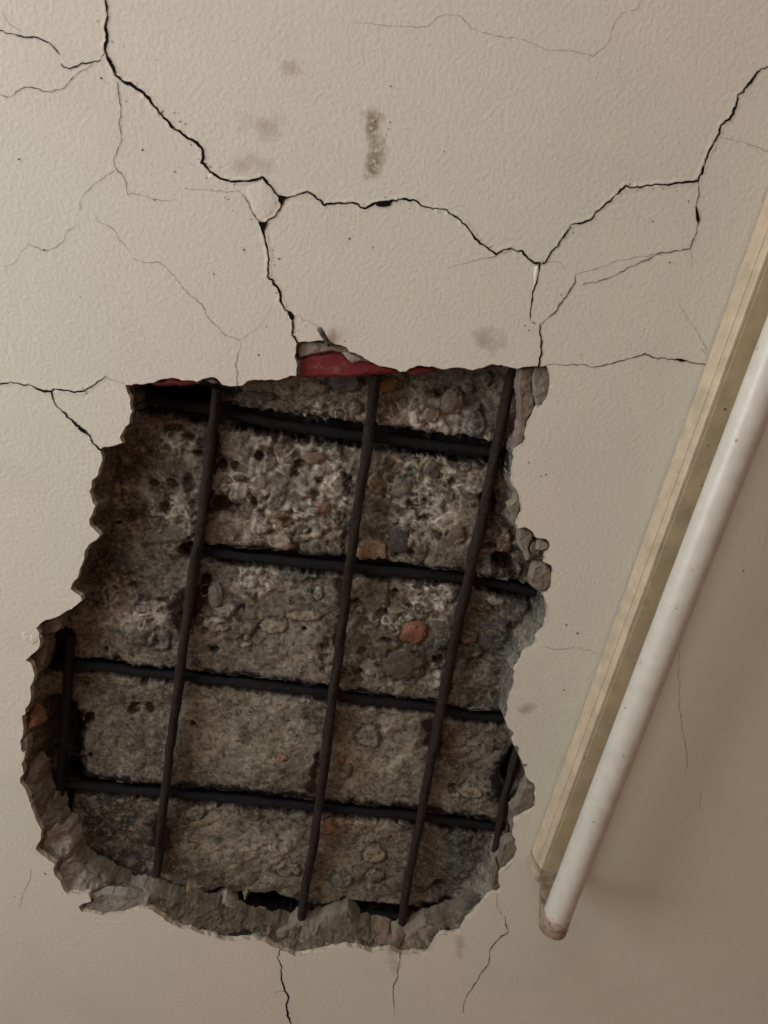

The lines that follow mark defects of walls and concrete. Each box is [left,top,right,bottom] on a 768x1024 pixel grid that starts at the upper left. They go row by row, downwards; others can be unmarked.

crack [0,0,768,386]
crack [0,374,125,451]
spalling [20,340,553,956]
crack [277,950,291,1024]
crack [462,894,508,1013]